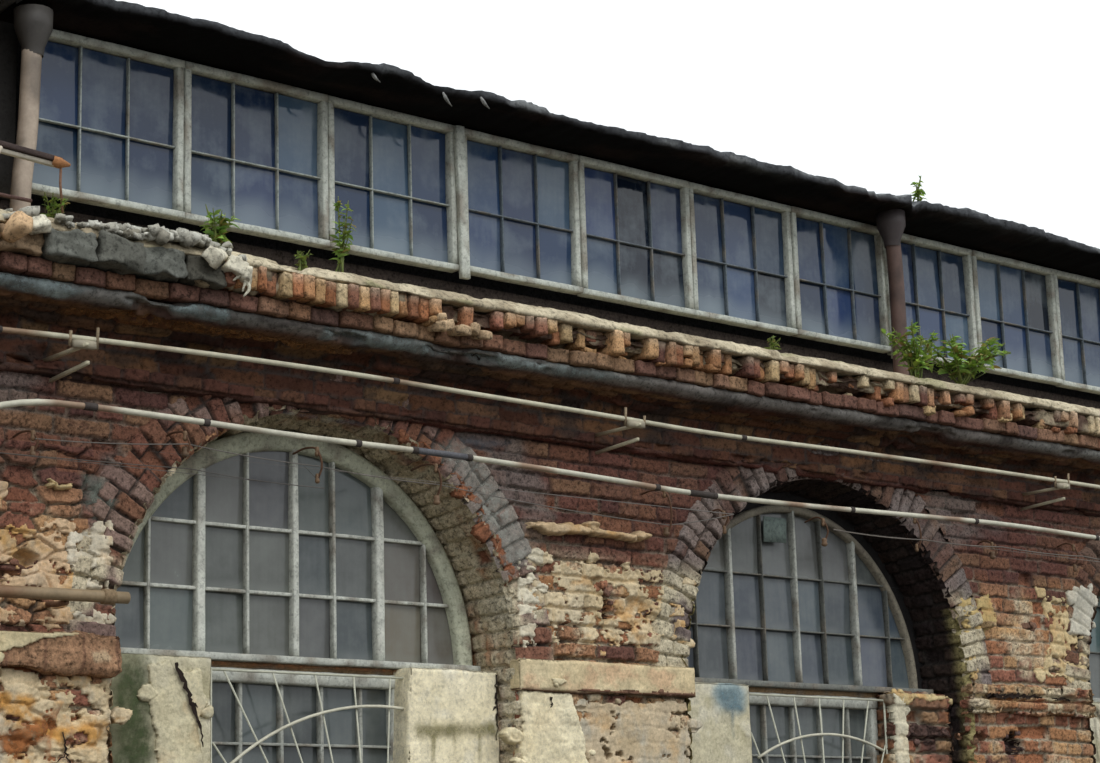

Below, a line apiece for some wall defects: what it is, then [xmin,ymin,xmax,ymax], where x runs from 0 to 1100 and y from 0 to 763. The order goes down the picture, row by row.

peeling [0,481,8,508]
peeling [44,478,73,491]
peeling [397,429,696,656]
peeling [0,517,214,763]
peeling [957,594,997,634]
peeling [1021,583,1098,683]
crack [175,662,203,747]
peeling [886,688,1024,763]